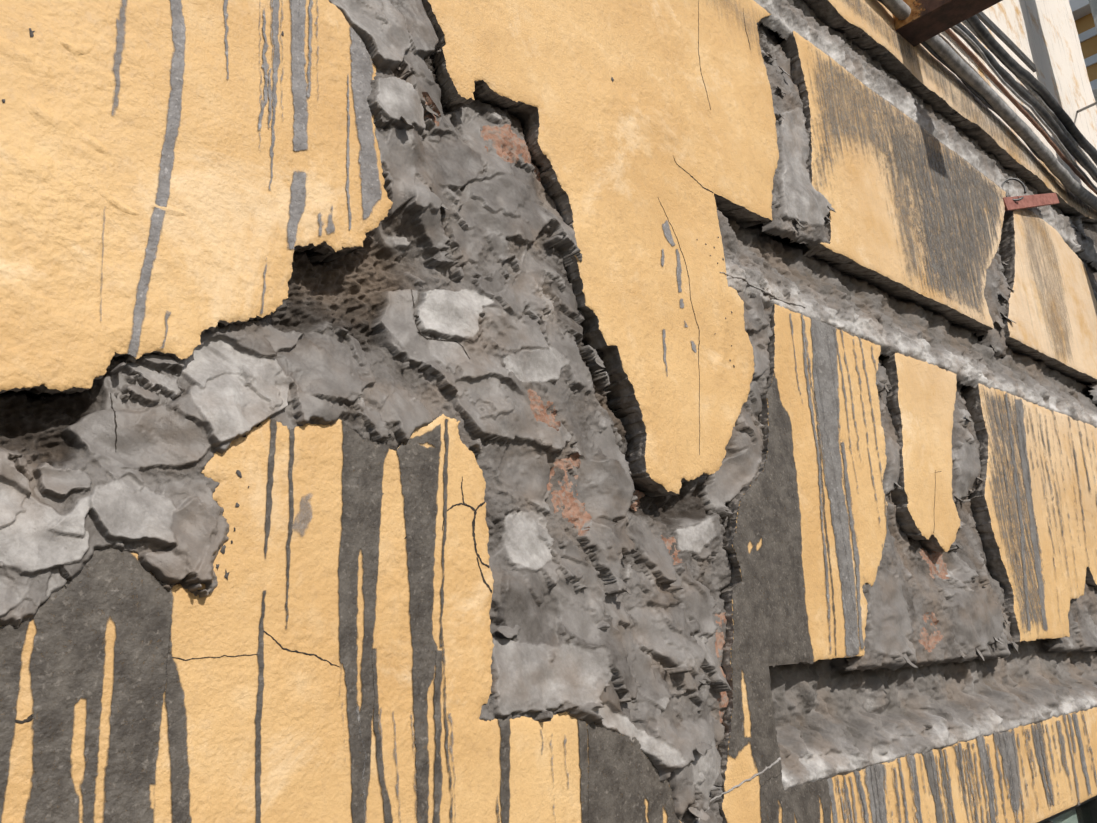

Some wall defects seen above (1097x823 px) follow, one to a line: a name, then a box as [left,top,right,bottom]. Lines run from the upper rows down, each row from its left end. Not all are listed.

water stain [0,548,192,823]
water stain [128,0,186,357]
crack [173,631,339,667]
water stain [264,418,312,628]
spalling [0,0,774,823]
water stain [338,419,456,823]
crack [442,477,492,593]
water stain [790,312,888,657]
water stain [727,373,1097,823]
spalling [976,247,1016,359]
spalling [1059,214,1097,301]
spalling [1088,381,1097,404]